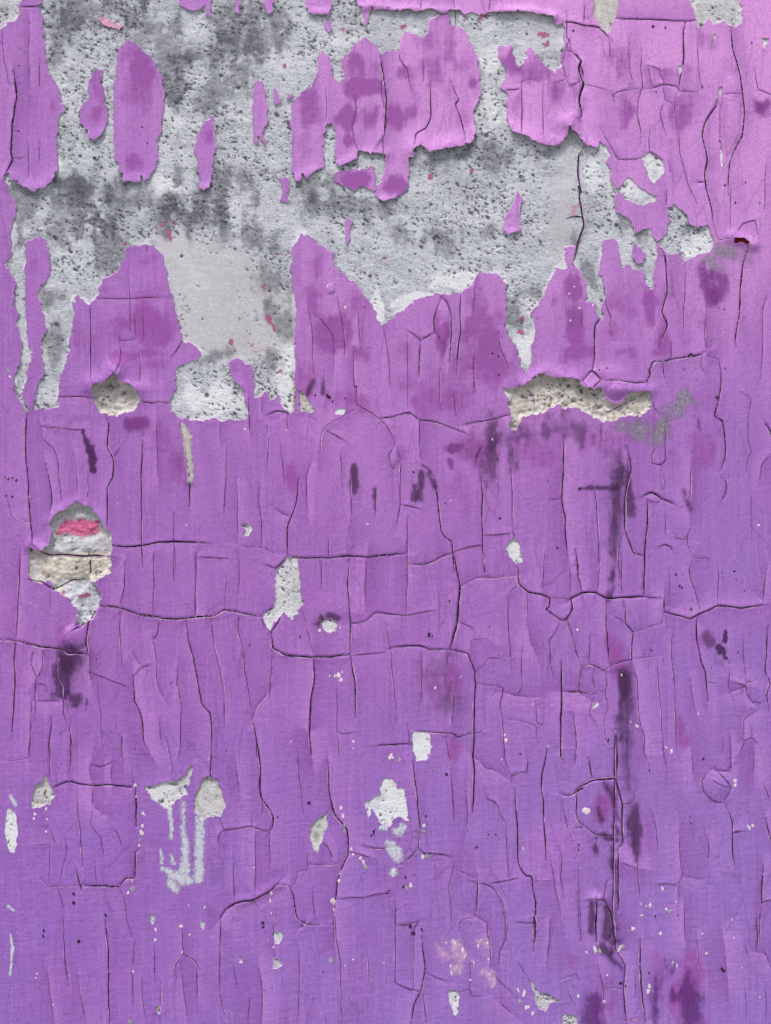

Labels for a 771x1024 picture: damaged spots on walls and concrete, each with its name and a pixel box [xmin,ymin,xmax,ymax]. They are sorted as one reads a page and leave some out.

peeling [0,0,24,29]
peeling [689,0,743,47]
peeling [4,0,714,431]
spalling [28,501,113,625]
peeling [262,556,304,630]
crack [0,248,771,1024]
peeling [412,731,432,761]
peeling [145,765,226,819]
peeling [365,777,409,826]
peeling [4,808,18,853]